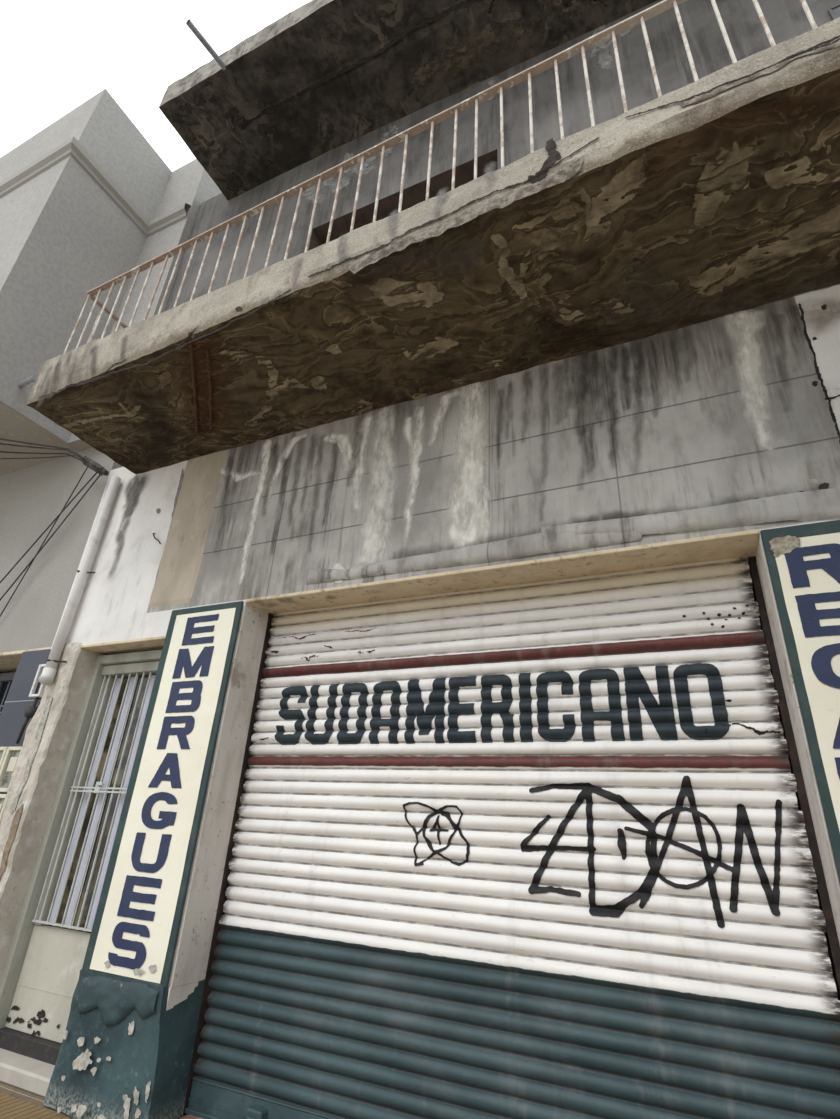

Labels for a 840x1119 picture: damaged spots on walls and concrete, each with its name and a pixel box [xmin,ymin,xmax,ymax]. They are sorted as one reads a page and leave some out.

crack [625,35,840,118]
crack [38,137,599,399]
leakage [725,311,772,450]
crack [798,303,840,443]
leakage [111,476,147,573]
leakage [221,434,307,584]
leakage [324,382,490,565]
peeling [6,1005,111,1081]
peeling [57,1102,106,1119]
peeling [122,1081,151,1119]